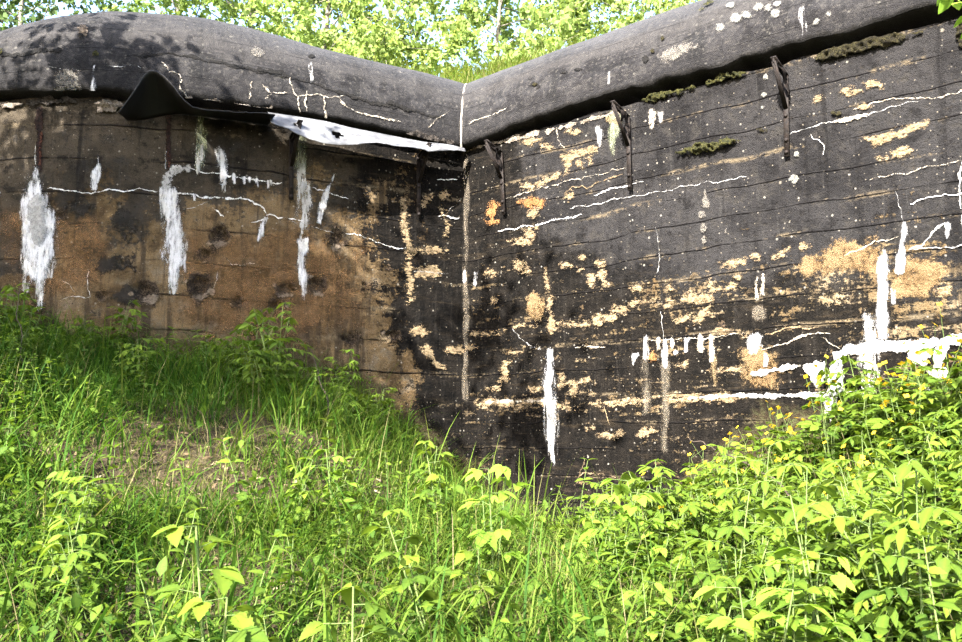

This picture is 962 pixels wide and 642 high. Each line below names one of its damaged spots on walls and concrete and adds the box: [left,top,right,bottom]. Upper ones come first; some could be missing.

leakage [20,169,96,307]
efflorescence [159,116,228,294]
crack [50,168,403,286]
crack [114,52,446,127]
leakage [296,136,348,295]
peeling [385,188,450,305]
spalling [477,109,626,248]
crack [499,168,744,232]
peeling [543,242,812,335]
leakage [632,222,962,422]
crack [791,90,961,154]
peeling [473,351,591,412]